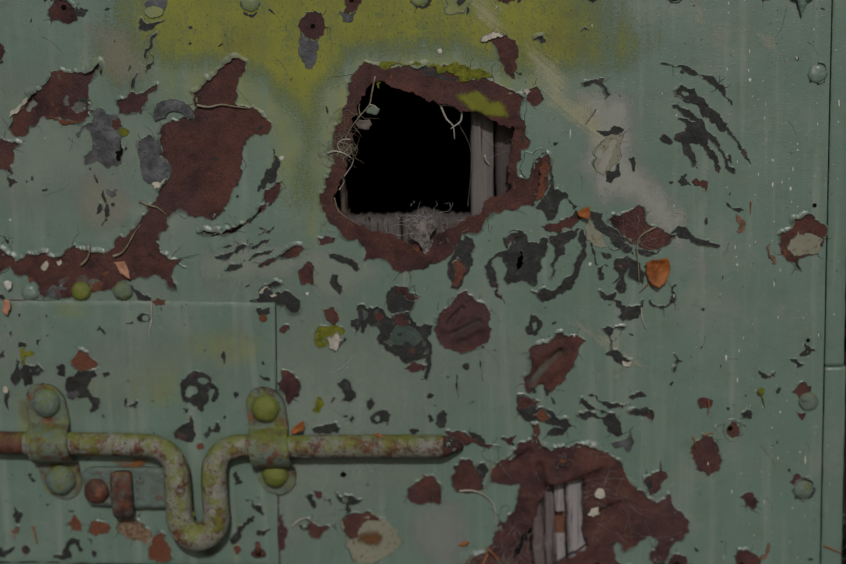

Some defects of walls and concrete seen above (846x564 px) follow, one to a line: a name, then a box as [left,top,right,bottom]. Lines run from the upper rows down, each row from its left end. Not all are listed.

peeling [660,62,733,105]
peeling [659,83,752,174]
peeling [0,52,287,306]
peeling [484,165,721,368]
peeling [314,234,493,381]
peeling [336,378,357,402]
peeling [366,397,391,425]
peeling [514,313,656,452]
peeling [697,397,714,409]
peeling [302,488,403,564]
rust [358,533,382,545]
rust [665,548,692,564]